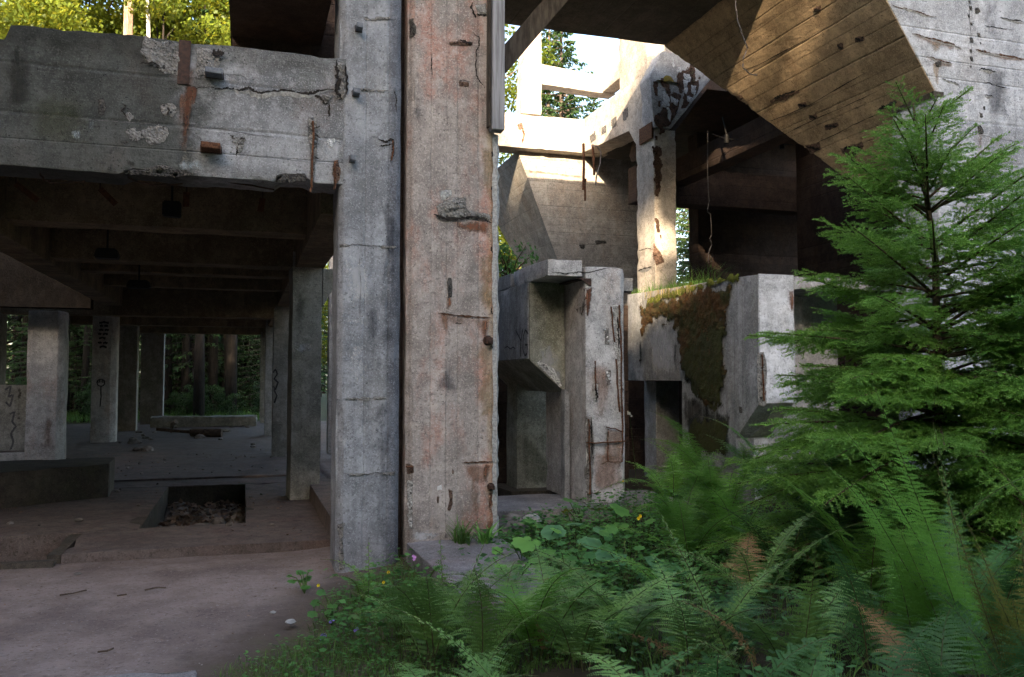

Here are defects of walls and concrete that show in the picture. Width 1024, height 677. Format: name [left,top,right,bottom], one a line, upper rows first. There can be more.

spalling [140,35,180,75]
crack [470,3,487,88]
spalling [121,103,177,145]
rust [180,86,197,135]
crack [196,74,334,116]
spalling [334,60,349,100]
peeling [652,59,701,197]
spalling [434,134,500,536]